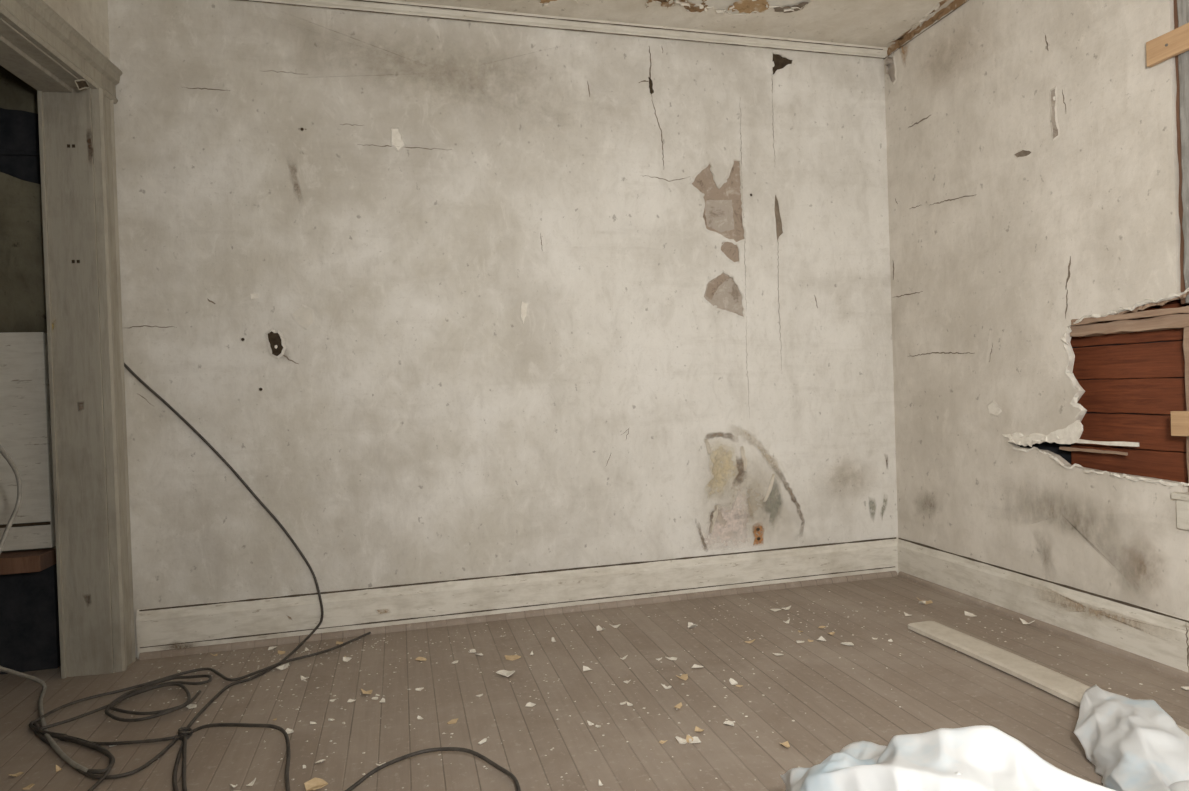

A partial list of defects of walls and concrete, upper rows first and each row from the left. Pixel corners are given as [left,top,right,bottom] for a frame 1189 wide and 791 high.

peeling [645,0,812,16]
crack [639,47,685,182]
flaking render [689,159,746,319]
flaking render [265,329,299,364]
flaking render [1002,288,1189,492]